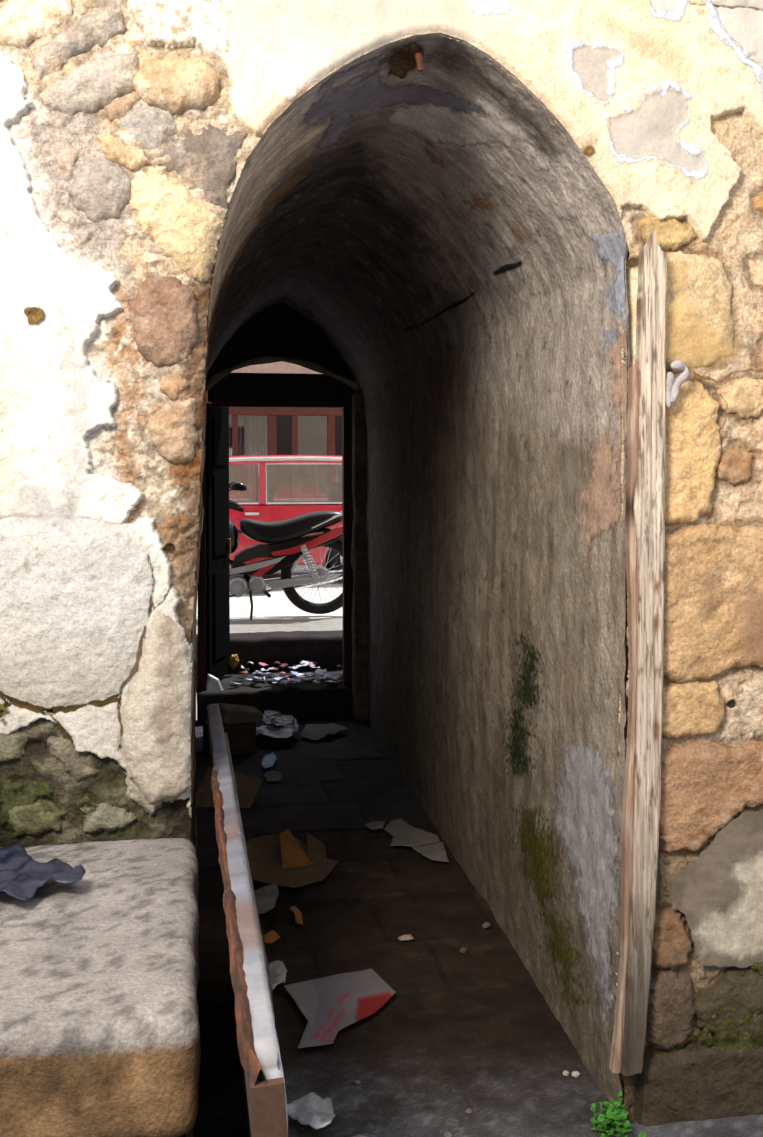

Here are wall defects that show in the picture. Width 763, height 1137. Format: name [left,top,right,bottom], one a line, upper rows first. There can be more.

peeling [215,0,548,170]
peeling [561,36,709,180]
peeling [649,0,690,21]
peeling [705,0,763,97]
spalling [0,0,261,687]
crack [0,554,172,750]
spalling [579,111,763,1126]
spalling [0,718,191,848]